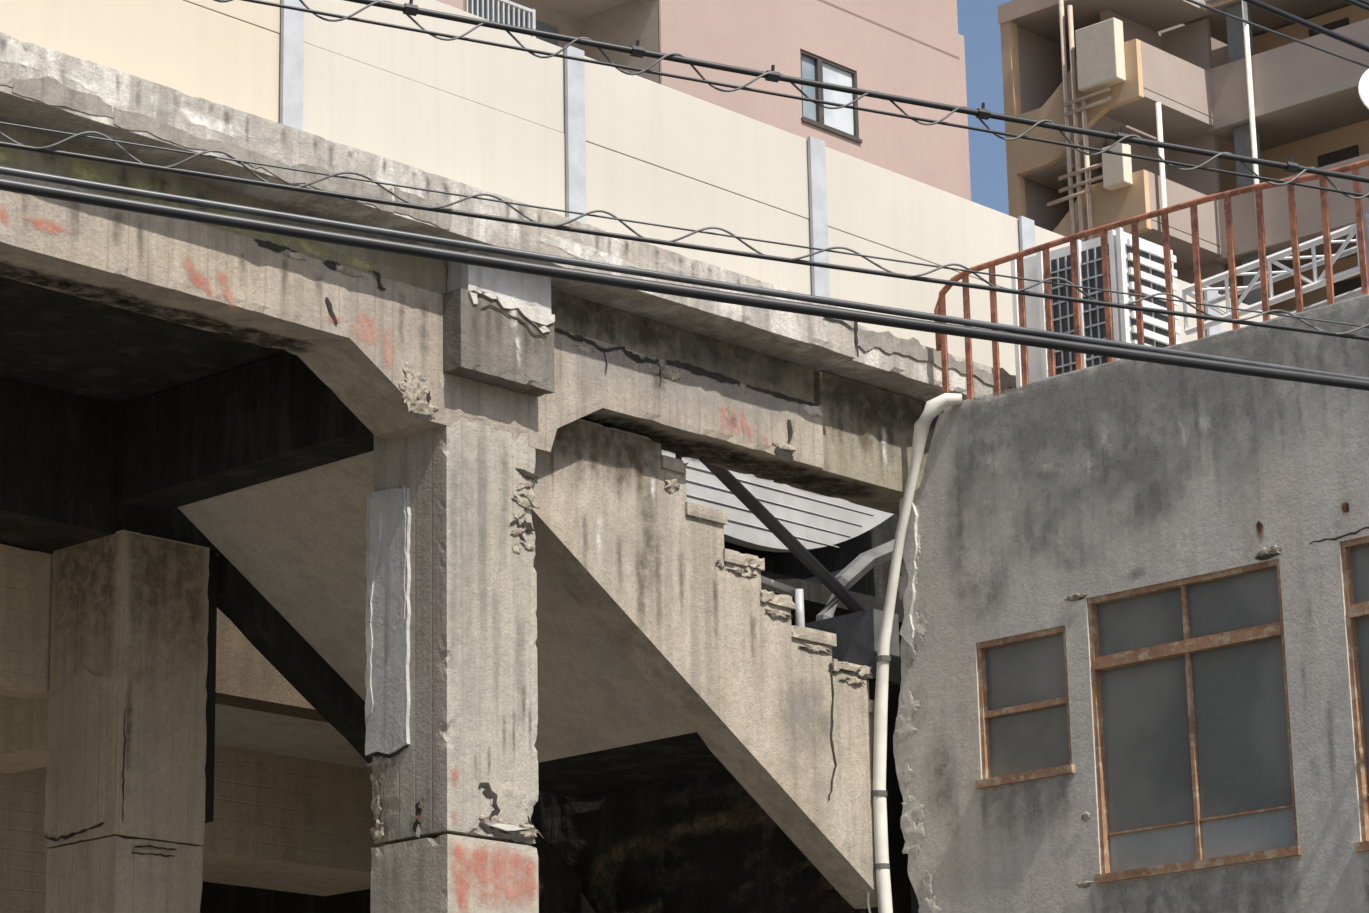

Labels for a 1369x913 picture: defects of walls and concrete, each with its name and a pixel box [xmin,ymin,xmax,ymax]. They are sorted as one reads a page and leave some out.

peeling [0,44,452,230]
peeling [542,234,637,267]
spalling [399,362,439,420]
crack [481,304,818,442]
damp [960,297,1369,502]
peeling [898,494,928,668]
crack [1309,527,1369,545]
peeling [365,487,411,843]
crack [765,610,866,801]
spalling [894,687,921,743]
spalling [479,780,538,842]
spalling [900,759,942,913]